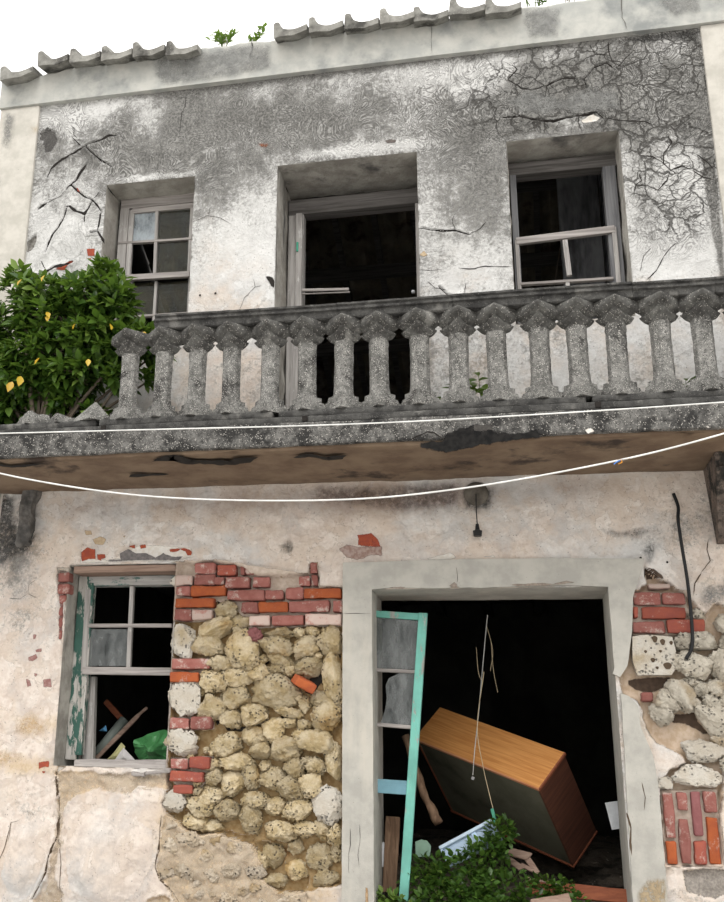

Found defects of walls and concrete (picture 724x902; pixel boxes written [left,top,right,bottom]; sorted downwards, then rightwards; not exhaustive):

crack [503,43,713,192]
crack [37,133,114,275]
crack [419,214,486,235]
crack [427,266,510,295]
peeling [340,533,382,560]
spalling [39,530,343,902]
spalling [619,568,724,899]